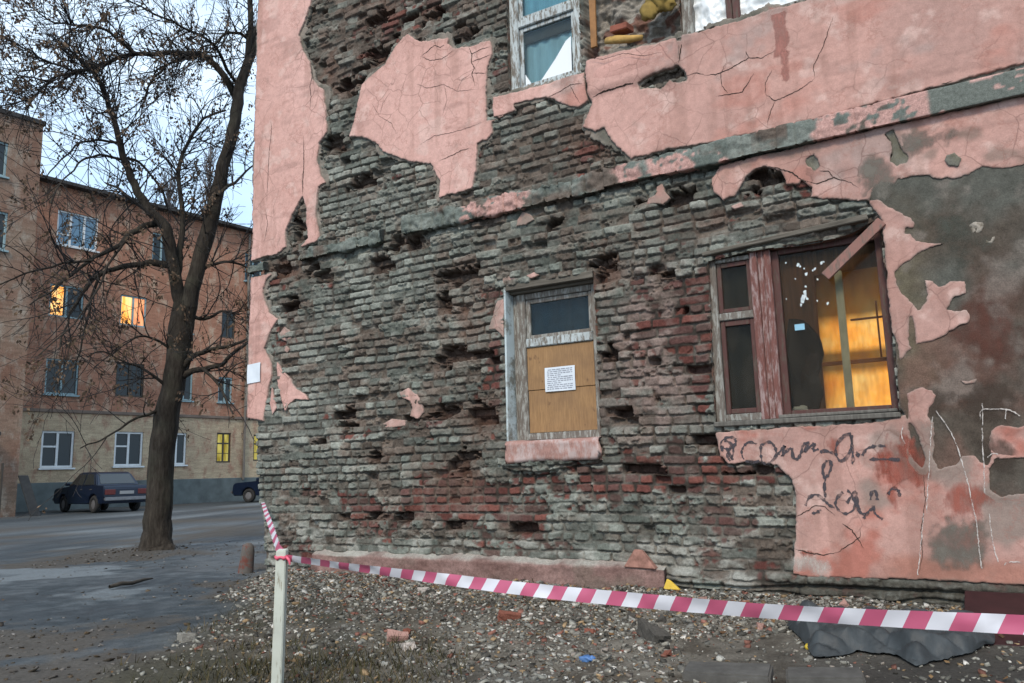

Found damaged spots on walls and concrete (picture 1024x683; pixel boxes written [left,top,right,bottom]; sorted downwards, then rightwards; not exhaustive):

crack [415,45,492,159]
crack [551,18,833,125]
water stain [861,158,894,200]
spalling [256,0,1024,586]
crack [796,505,863,556]